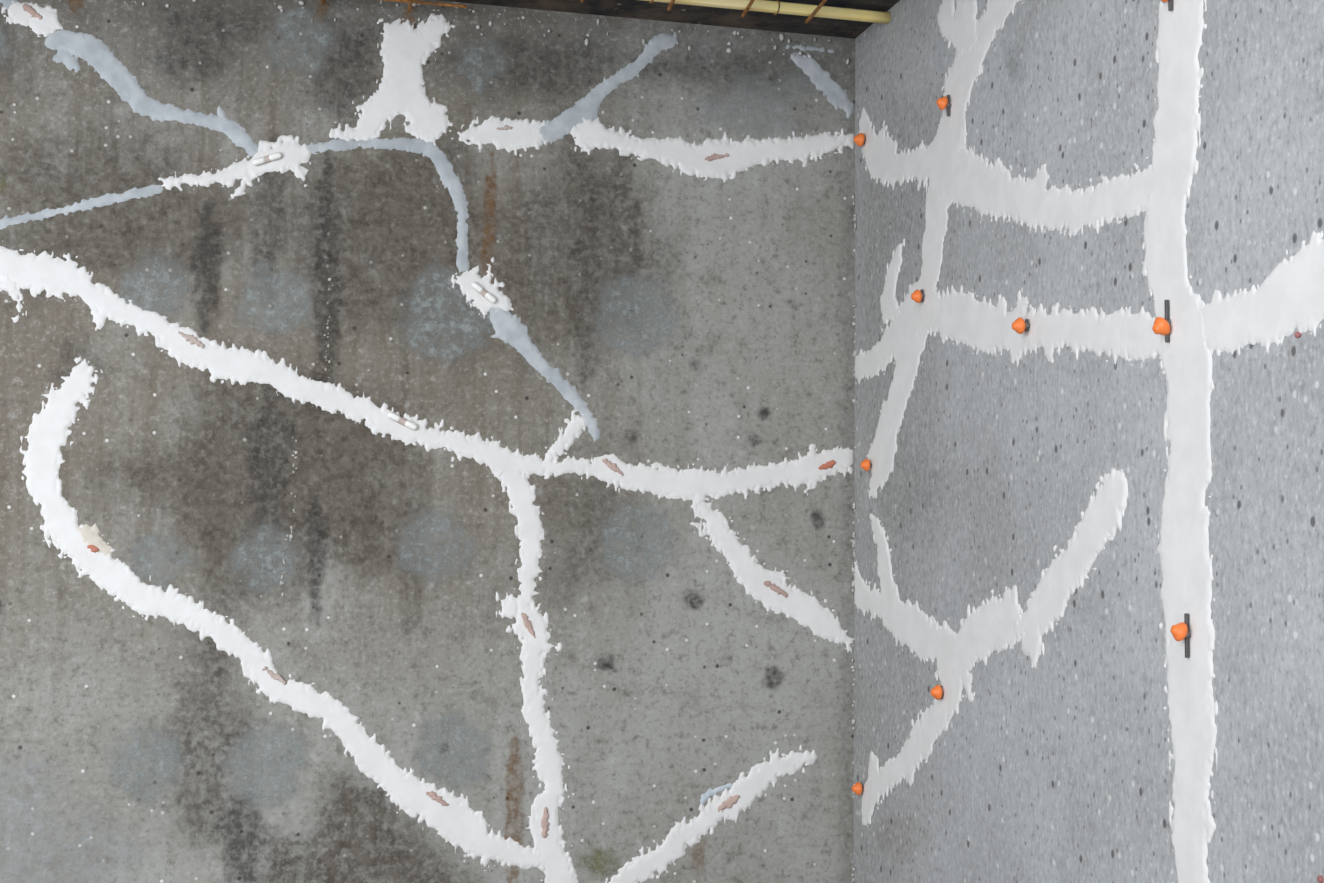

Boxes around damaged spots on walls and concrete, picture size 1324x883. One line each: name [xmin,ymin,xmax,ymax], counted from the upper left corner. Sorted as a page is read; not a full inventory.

damp [3,148,240,330]
damp [299,149,479,318]
damp [504,153,648,321]
damp [134,382,396,610]
crack [0,0,853,883]
crack [451,0,1324,883]
damp [175,636,450,883]